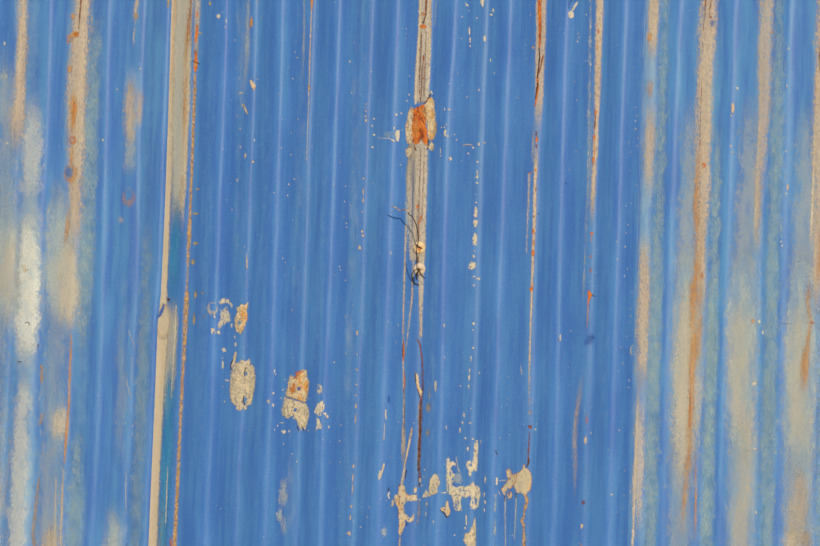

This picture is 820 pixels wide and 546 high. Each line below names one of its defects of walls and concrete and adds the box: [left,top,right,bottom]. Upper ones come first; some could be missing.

rust [405,91,437,157]
rust [170,11,199,546]
peeling [207,298,237,369]
peeling [386,361,434,546]
peeling [496,459,532,501]